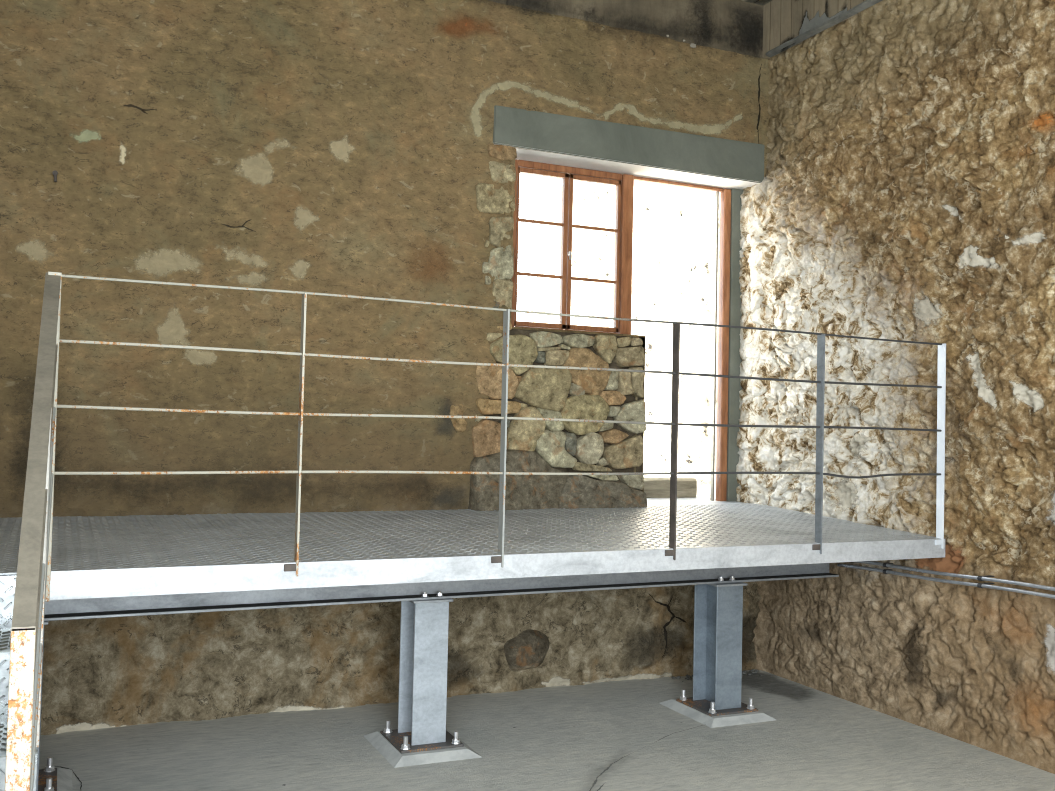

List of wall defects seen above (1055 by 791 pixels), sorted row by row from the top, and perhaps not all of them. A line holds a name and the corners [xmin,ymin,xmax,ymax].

peeling [237,139,288,184]
peeling [330,136,355,162]
peeling [295,207,319,230]
peeling [136,248,200,276]
peeling [223,248,267,285]
peeling [958,245,999,269]
peeling [1005,233,1046,246]
peeling [967,352,997,409]
peeling [1009,381,1045,412]
crack [649,594,686,656]
peeling [1045,625,1055,671]
crack [589,725,703,791]